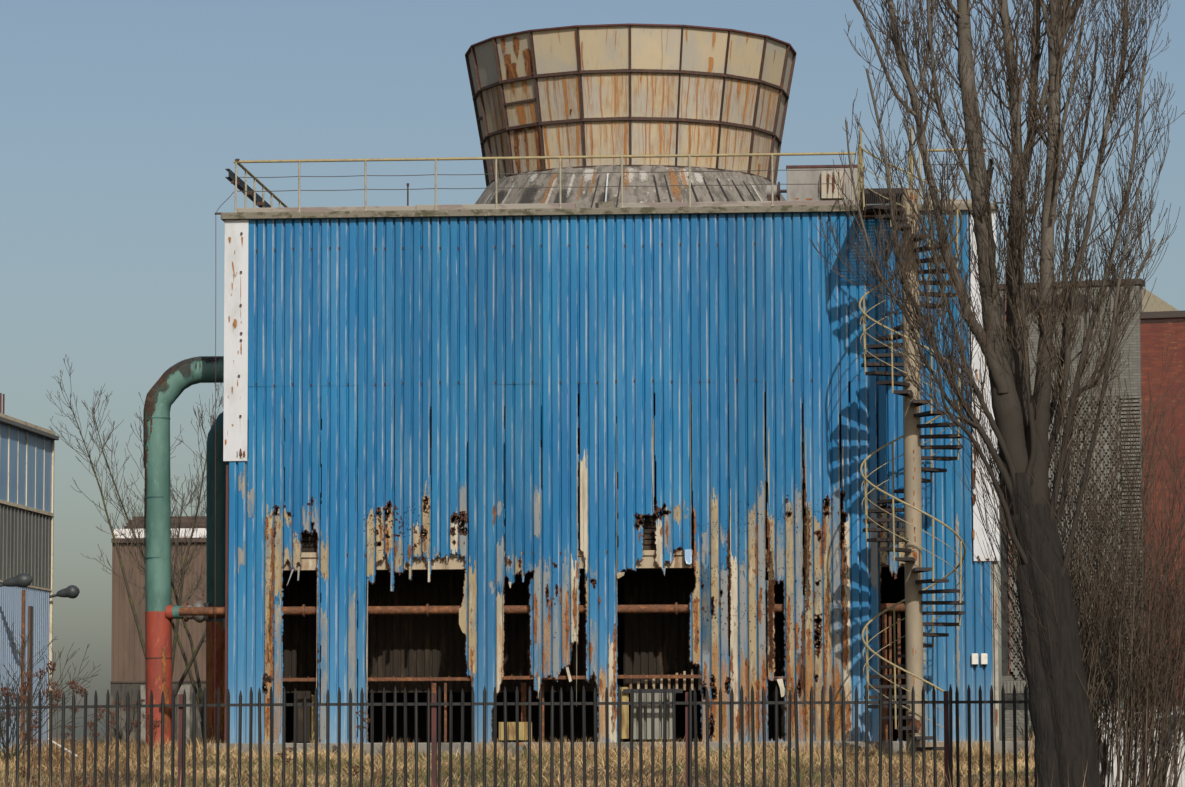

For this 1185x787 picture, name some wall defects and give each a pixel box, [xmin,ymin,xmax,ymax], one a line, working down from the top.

rust [487,32,777,203]
rust [265,505,302,737]
peeling [348,481,438,743]
peeling [450,450,617,742]
peeling [639,495,690,569]
rust [617,466,852,742]